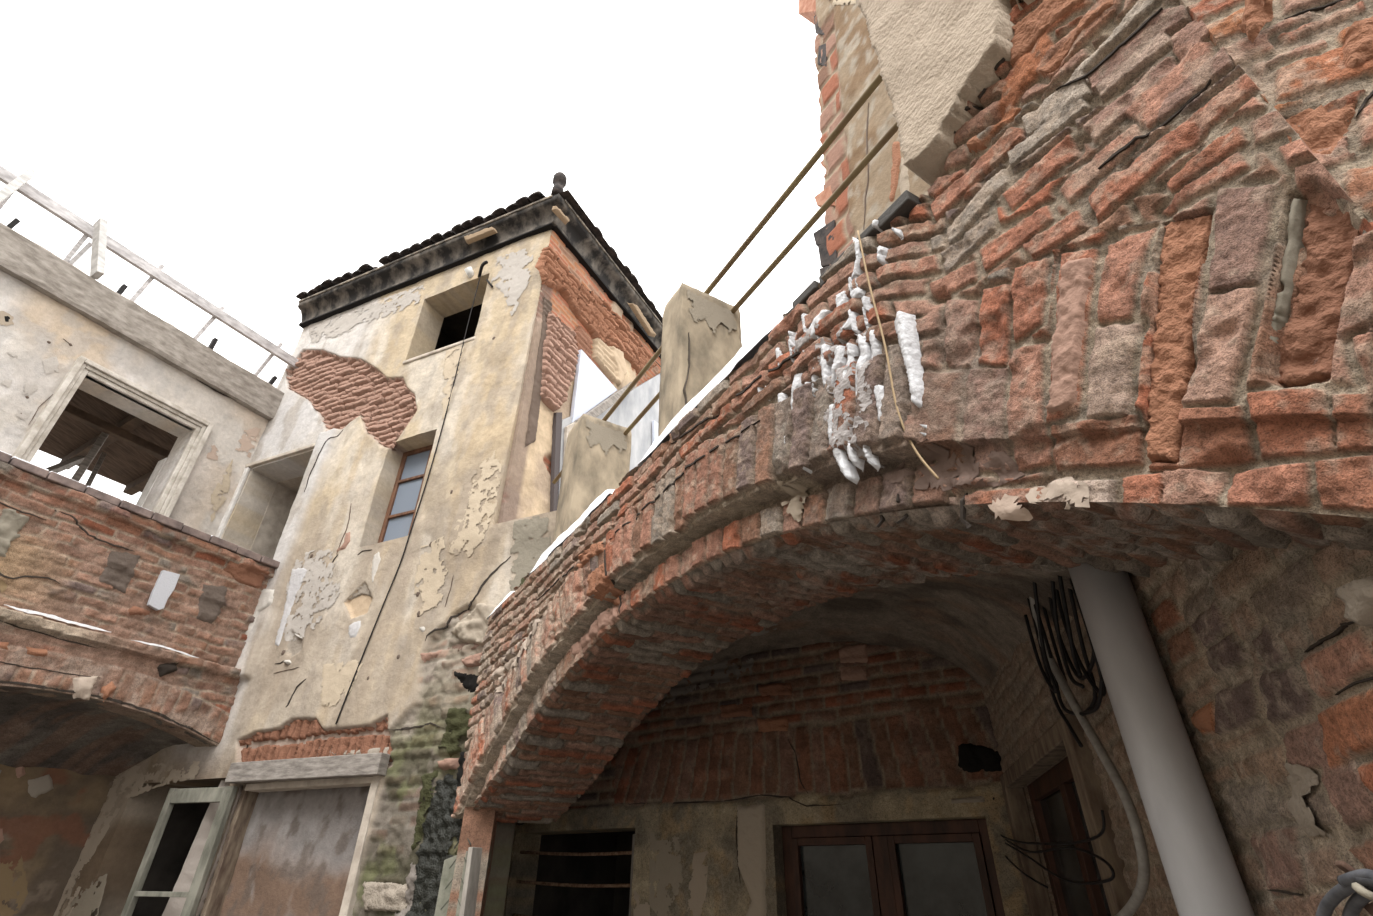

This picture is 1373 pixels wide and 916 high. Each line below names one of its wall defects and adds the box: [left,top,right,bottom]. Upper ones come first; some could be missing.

peeling [285,350,417,451]
peeling [535,246,658,412]
water stain [757,220,1090,509]
crack [536,333,801,615]
crack [0,502,133,551]
crack [332,506,372,563]
crack [0,573,60,584]
peeling [344,552,381,638]
crack [425,556,511,641]
crack [1304,621,1355,653]
peeling [239,717,393,765]
crack [388,722,442,731]